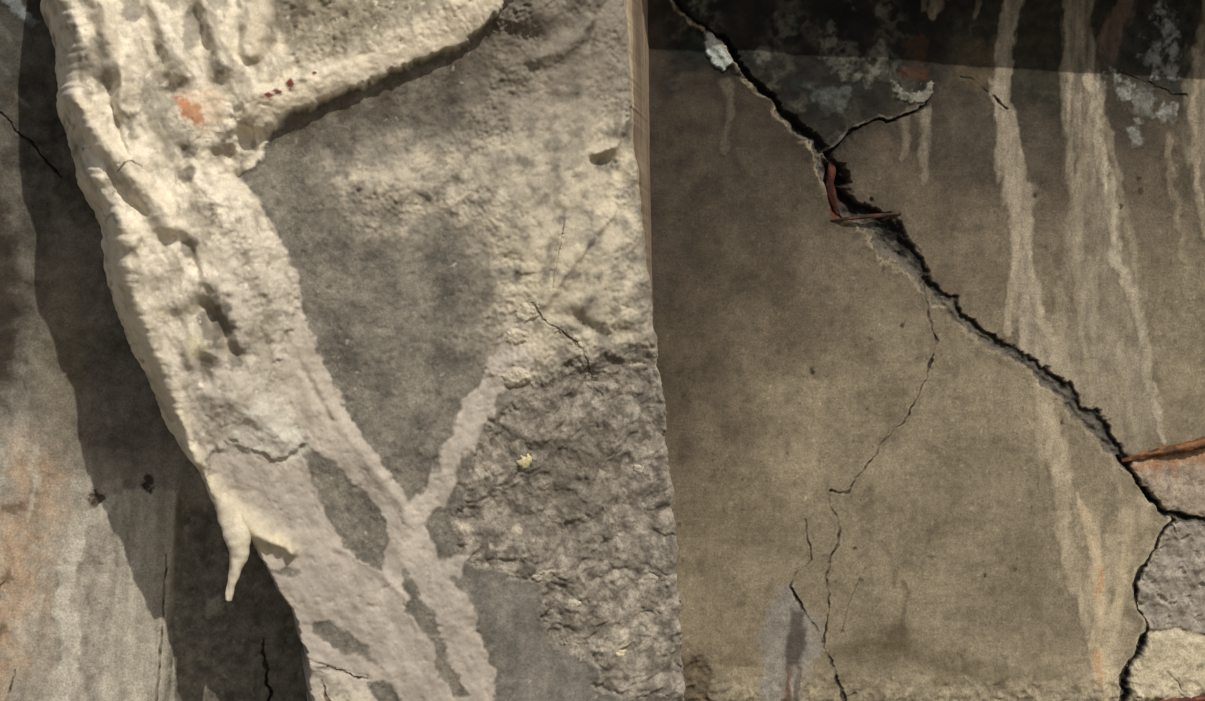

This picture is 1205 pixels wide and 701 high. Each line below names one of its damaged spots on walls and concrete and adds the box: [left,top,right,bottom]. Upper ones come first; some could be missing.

crack [0,109,66,182]
leakage [291,0,658,418]
rust [825,160,840,215]
leakage [647,0,1205,454]
leakage [21,490,116,701]
leakage [214,387,315,471]
crack [257,633,278,701]
crack [304,651,372,701]
crack [665,0,1205,701]
leakage [752,383,1161,701]
spalling [881,466,1205,701]
rust [1120,435,1205,489]